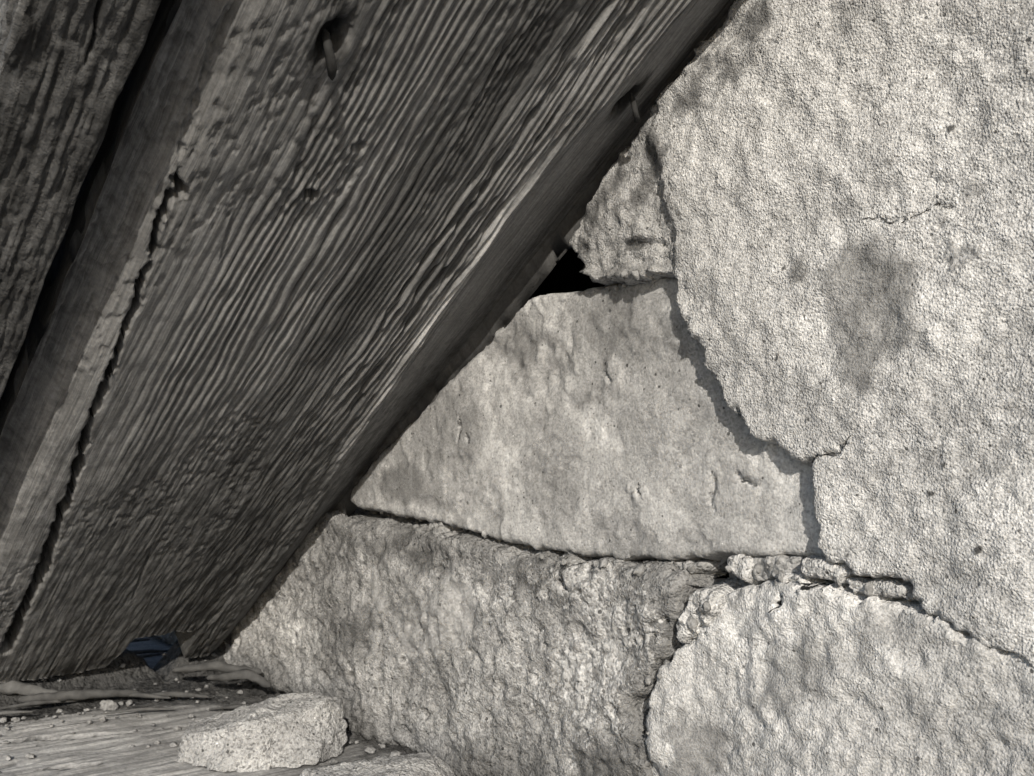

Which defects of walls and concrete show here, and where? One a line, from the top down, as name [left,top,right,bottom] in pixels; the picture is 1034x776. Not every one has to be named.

crack [768,576,899,613]